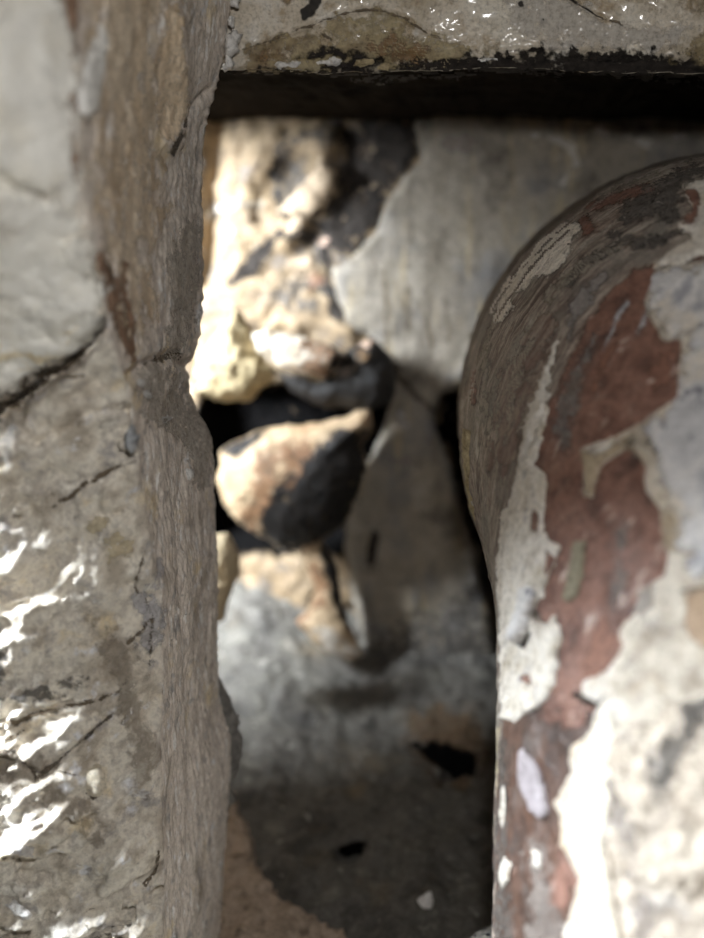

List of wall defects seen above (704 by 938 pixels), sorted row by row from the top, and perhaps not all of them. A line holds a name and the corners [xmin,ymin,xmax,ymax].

leakage [243,6,470,75]
leakage [506,47,544,59]
crack [571,0,623,26]
leakage [569,53,639,63]
peeling [479,179,704,938]
corrosion [492,263,681,938]
crack [0,682,126,781]
crack [143,850,160,887]